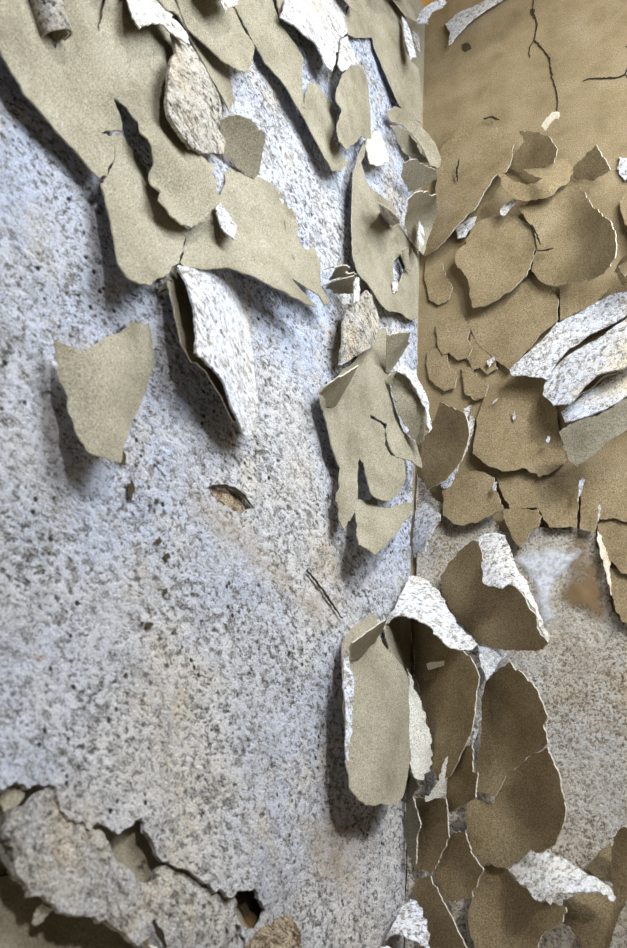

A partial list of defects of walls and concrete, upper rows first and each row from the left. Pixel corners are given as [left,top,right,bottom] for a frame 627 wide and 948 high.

crack [528,0,559,112]
crack [583,46,627,81]
peeling [273,0,617,320]
flaking render [617,156,627,182]
peeling [619,192,627,226]
peeling [615,255,627,286]
flaking render [0,0,432,948]
flaking render [384,275,627,948]